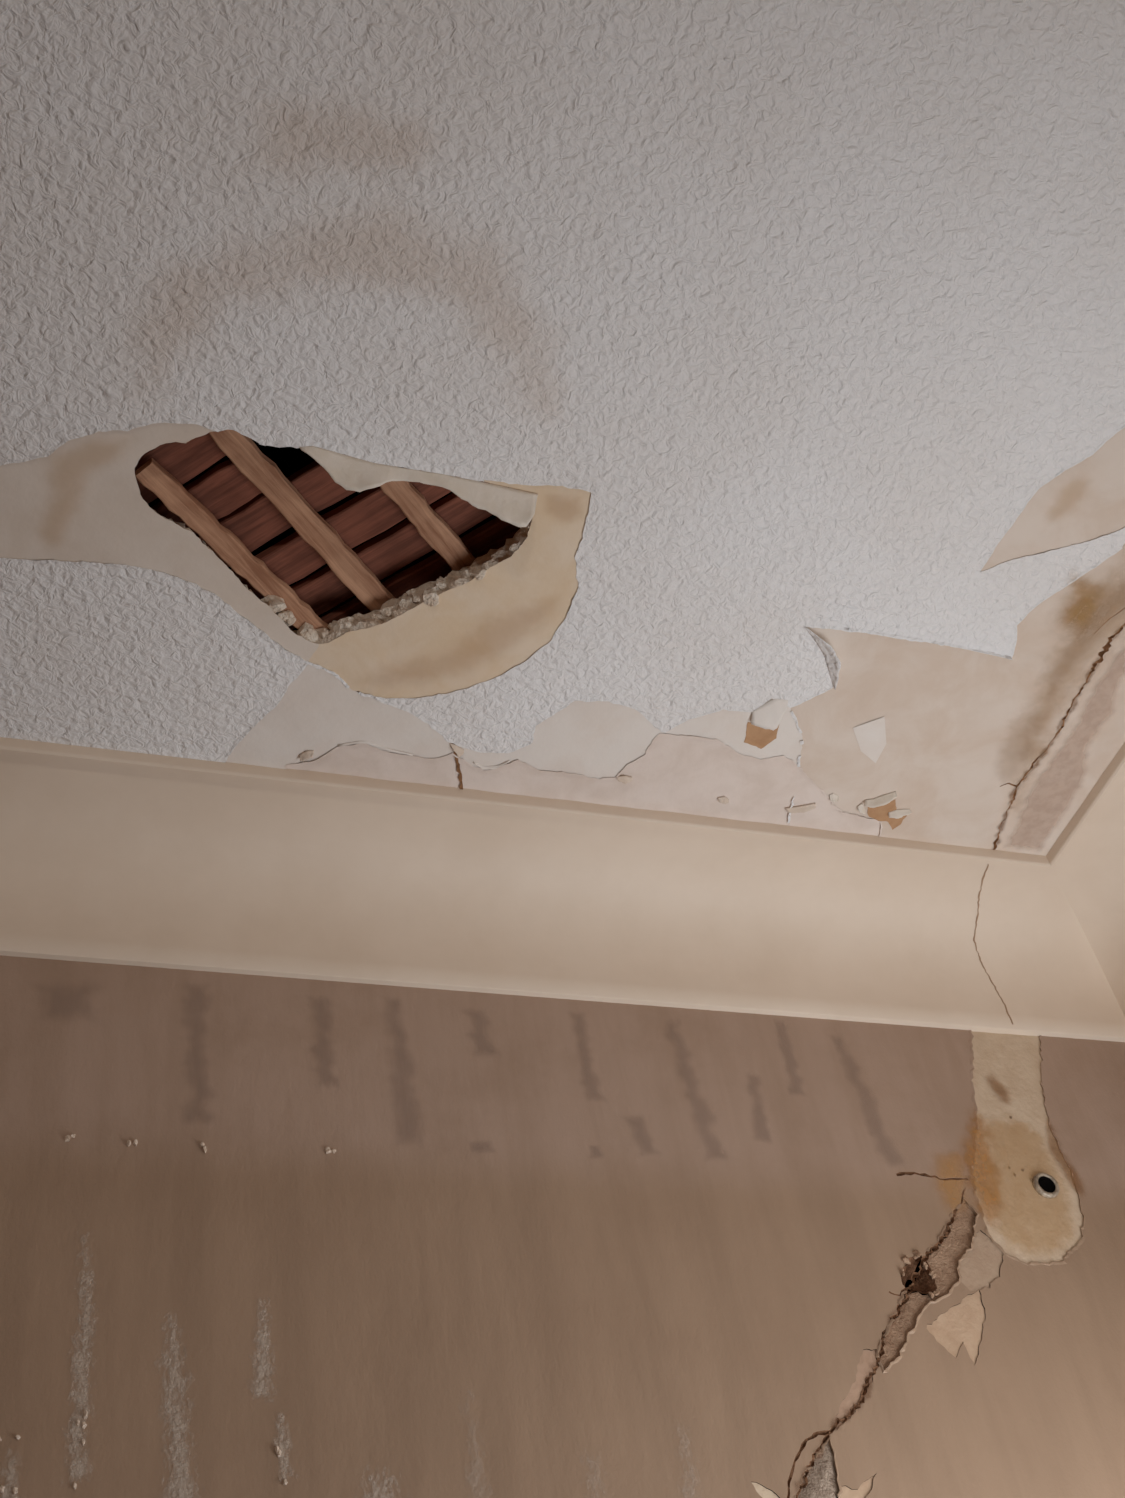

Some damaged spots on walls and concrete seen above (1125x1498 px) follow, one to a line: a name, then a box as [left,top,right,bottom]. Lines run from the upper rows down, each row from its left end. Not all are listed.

flaking render [244,519,532,659]
crack [451,743,463,789]
crack [973,607,1125,1024]
damp [70,1259,93,1478]
damp [165,1318,193,1498]
flaking render [751,1437,875,1498]
crack [787,1172,968,1498]